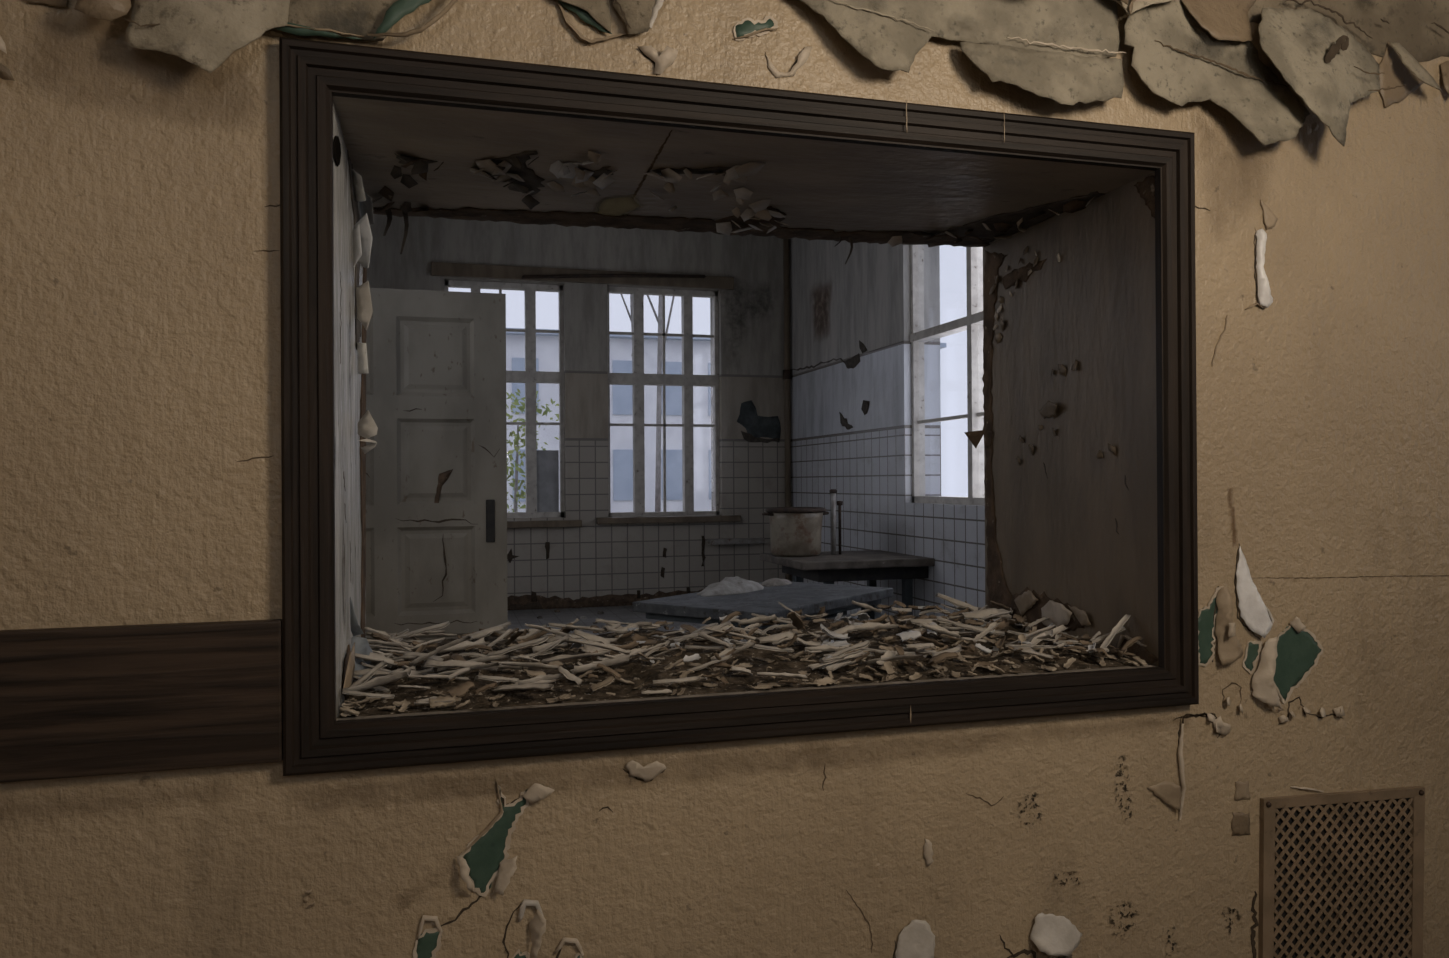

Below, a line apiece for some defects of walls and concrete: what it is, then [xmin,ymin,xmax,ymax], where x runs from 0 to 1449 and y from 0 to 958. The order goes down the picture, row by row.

peeling [25,0,458,73]
peeling [733,16,812,78]
peeling [1245,199,1278,310]
flaking render [342,150,1158,705]
peeling [1198,544,1323,710]
peeling [413,782,555,958]
peeling [502,899,584,958]
peeling [893,919,935,958]
peeling [1000,913,1082,958]